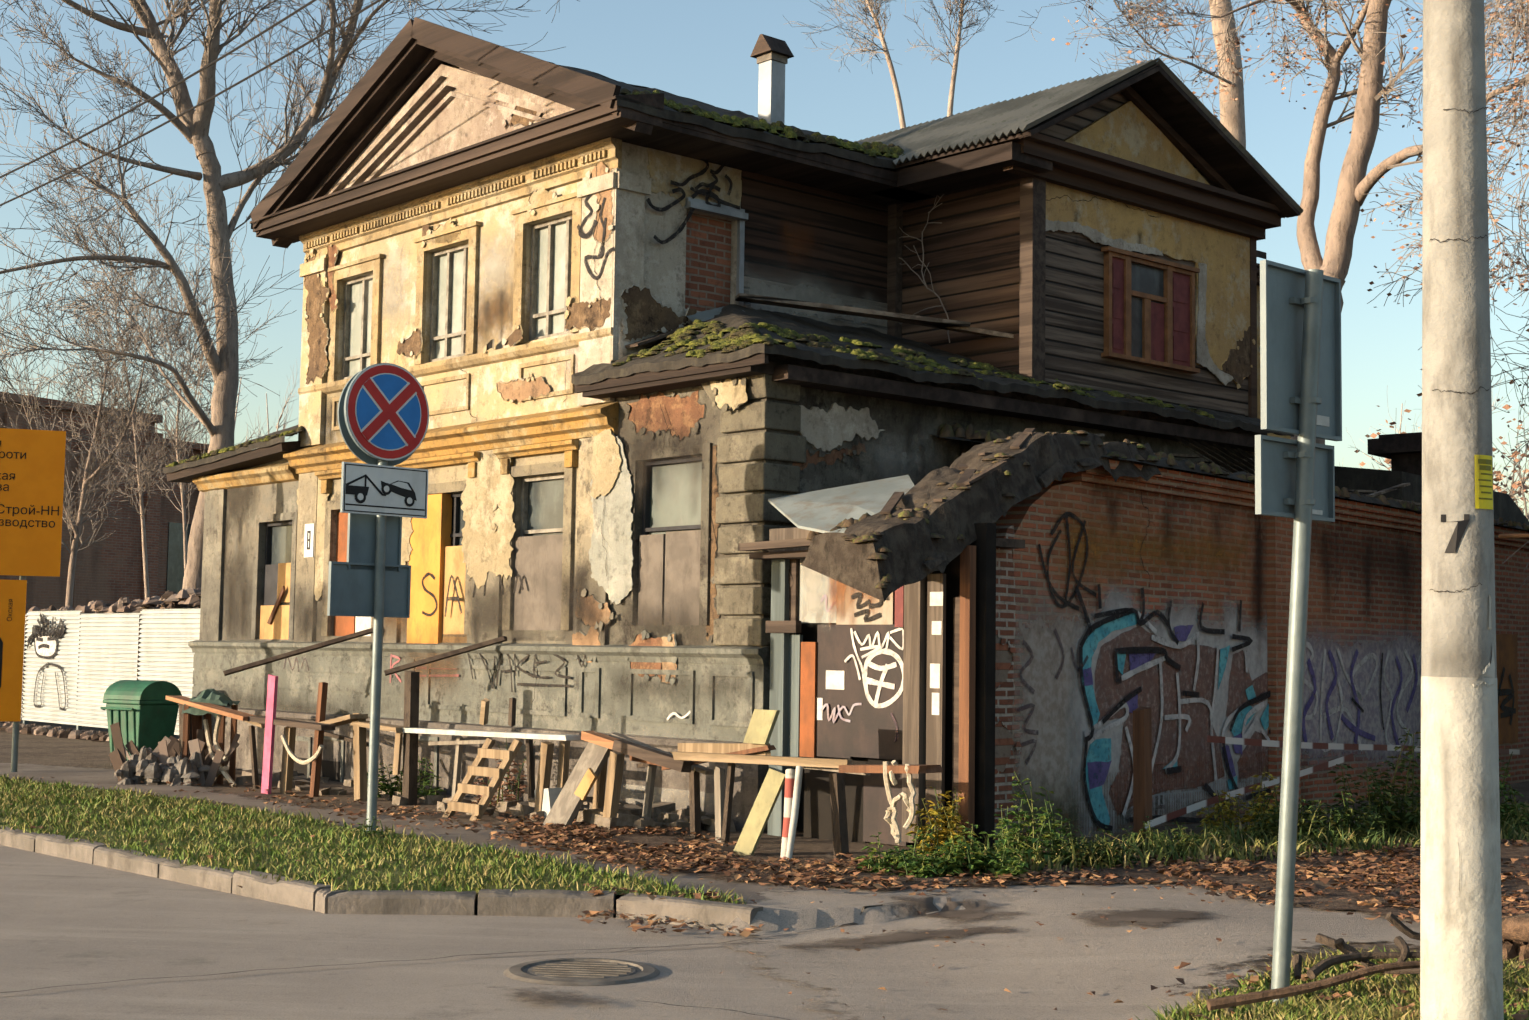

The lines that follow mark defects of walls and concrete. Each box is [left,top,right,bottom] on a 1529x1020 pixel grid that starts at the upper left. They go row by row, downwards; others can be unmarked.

peeling [1046,219,1163,256]
peeling [304,244,339,385]
peeling [496,372,550,404]
peeling [564,284,697,343]
peeling [798,403,884,452]
peeling [1196,262,1260,389]
peeling [461,452,517,589]
peeling [570,377,747,663]